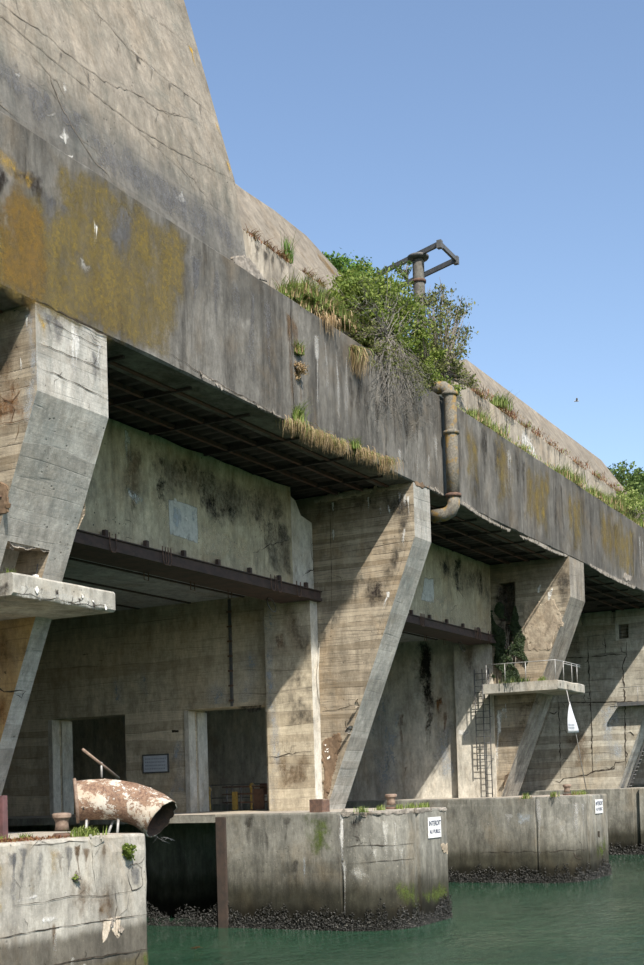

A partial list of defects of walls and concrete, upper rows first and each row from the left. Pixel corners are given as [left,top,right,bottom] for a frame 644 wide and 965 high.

crack [0,1,225,211]
spalling [0,481,11,515]
peeling [169,498,198,543]
leakage [154,461,290,574]
leakage [420,644,433,704]
crack [550,638,637,783]
spalling [321,726,353,799]